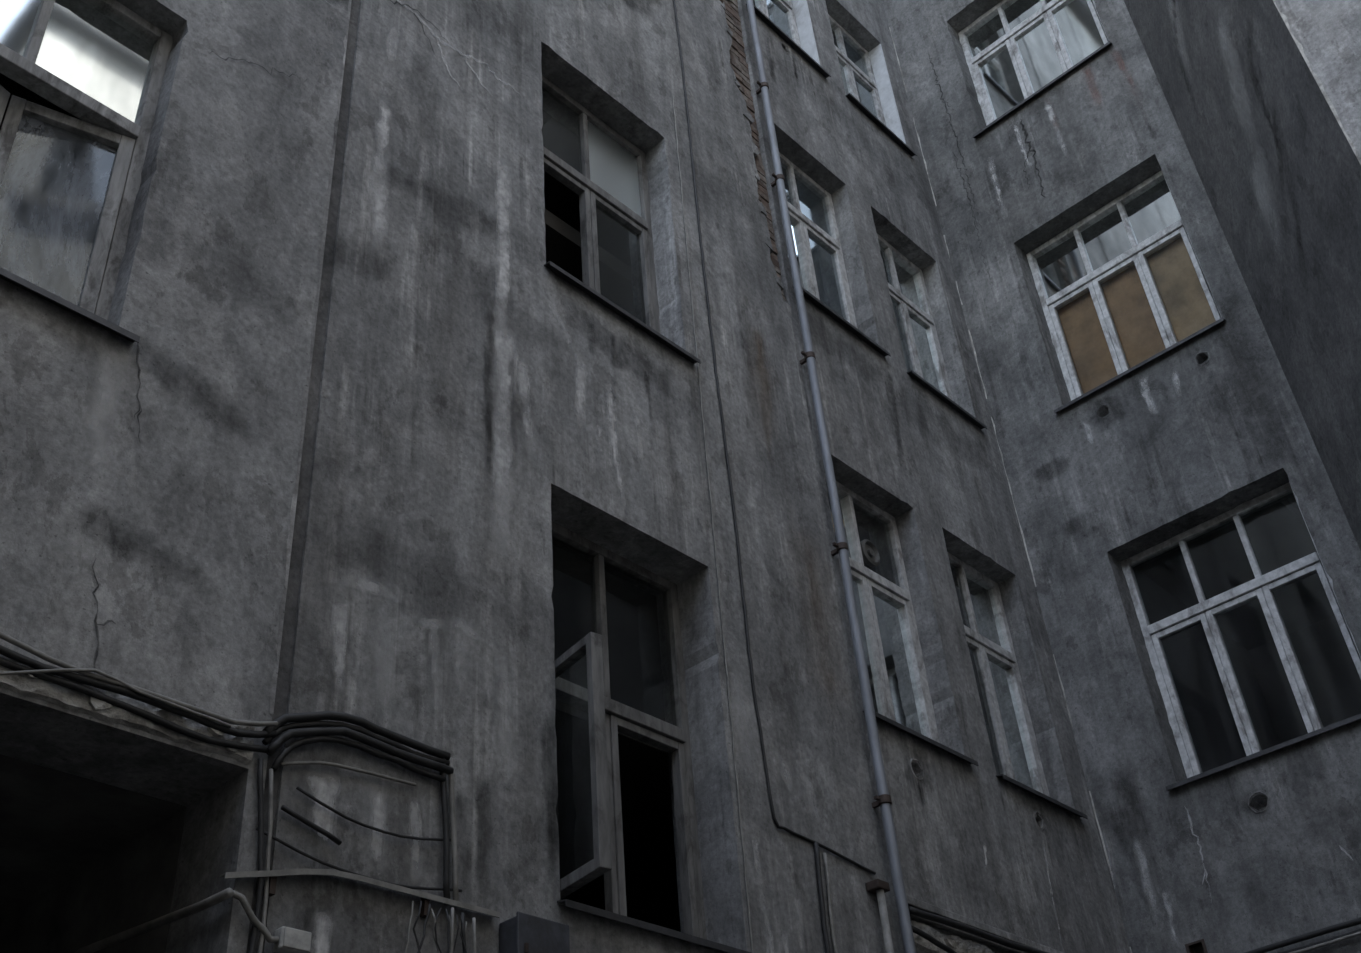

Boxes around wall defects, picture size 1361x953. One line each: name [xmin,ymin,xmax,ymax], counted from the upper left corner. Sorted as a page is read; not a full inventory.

leakage [376,107,390,168]
flaking render [720,0,785,300]
crack [1020,120,1045,197]
leakage [374,185,386,230]
leakage [497,171,510,299]
crack [889,27,1036,587]
crack [135,346,143,441]
leakage [485,315,529,513]
crack [92,559,116,673]
crack [1053,654,1073,727]
crack [1089,791,1112,874]